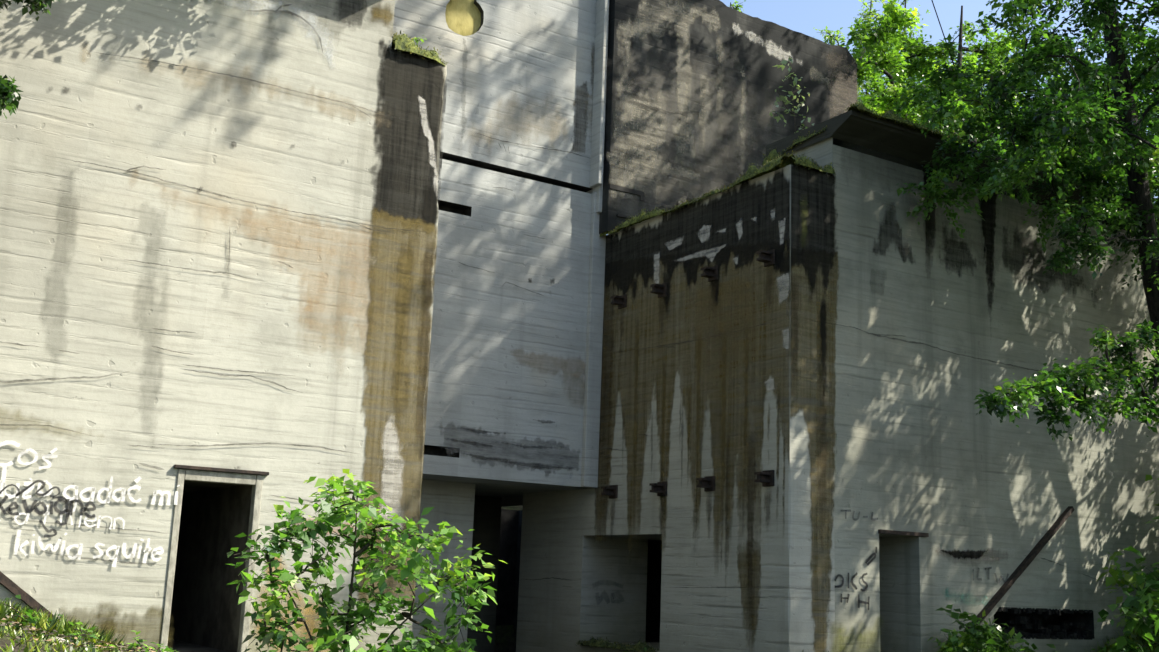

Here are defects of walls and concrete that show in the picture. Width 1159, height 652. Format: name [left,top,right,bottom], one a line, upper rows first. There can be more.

crack [248,4,323,52]
water stain [372,7,392,23]
water stain [733,24,791,61]
water stain [609,1,723,197]
water stain [873,206,912,263]
water stain [923,164,937,256]
water stain [979,183,997,307]
water stain [359,41,447,603]
water stain [596,162,839,652]